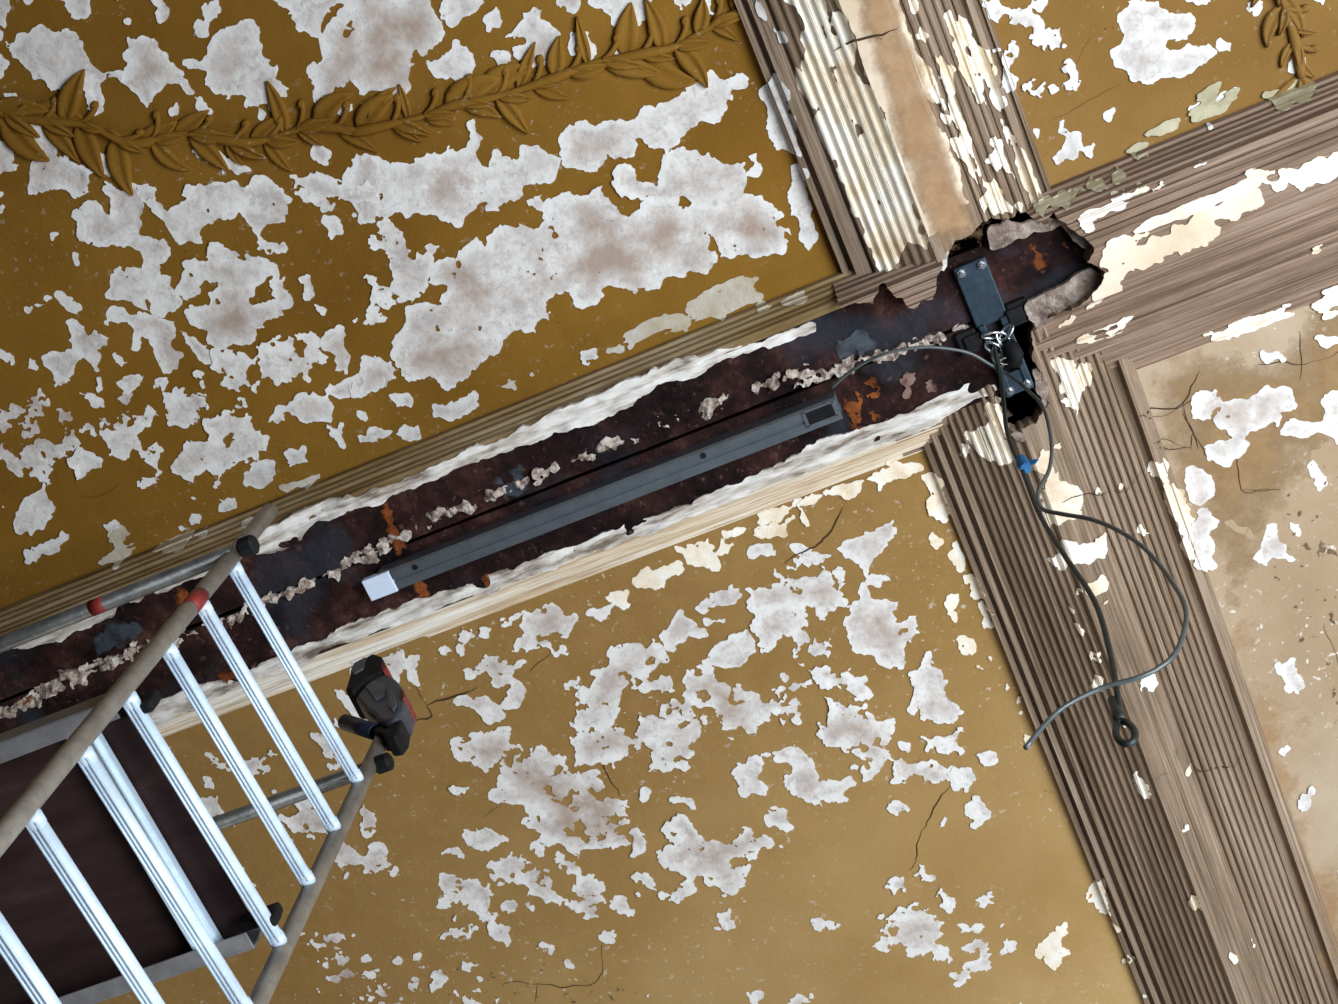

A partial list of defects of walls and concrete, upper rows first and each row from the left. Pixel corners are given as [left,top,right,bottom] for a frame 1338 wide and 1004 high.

peeling [0,0,289,121]
leakage [863,0,971,236]
peeling [916,0,1165,250]
peeling [1110,0,1231,85]
rust [1029,244,1044,270]
peeling [0,69,819,570]
rust [844,379,880,432]
rust [900,372,936,399]
rust [381,503,406,555]
spalling [174,321,816,648]
peeling [1147,385,1338,572]
rust [218,671,237,684]